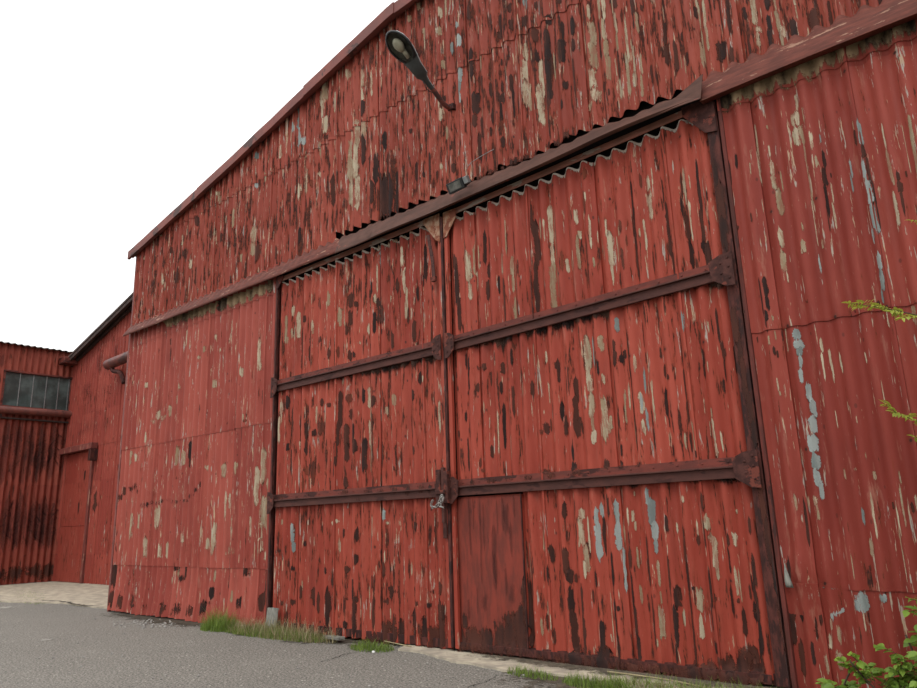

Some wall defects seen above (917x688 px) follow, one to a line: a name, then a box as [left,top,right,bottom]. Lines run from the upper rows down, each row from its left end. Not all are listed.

peeling [521,42,556,128]
peeling [584,0,644,111]
water stain [718,19,916,113]
peeling [539,205,620,308]
peeling [849,158,890,328]
peeling [581,335,614,445]
peeling [768,315,825,520]
rust [280,567,333,632]
rust [343,554,448,649]
peeling [577,498,640,593]
rust [456,494,766,687]
peeling [825,591,870,675]